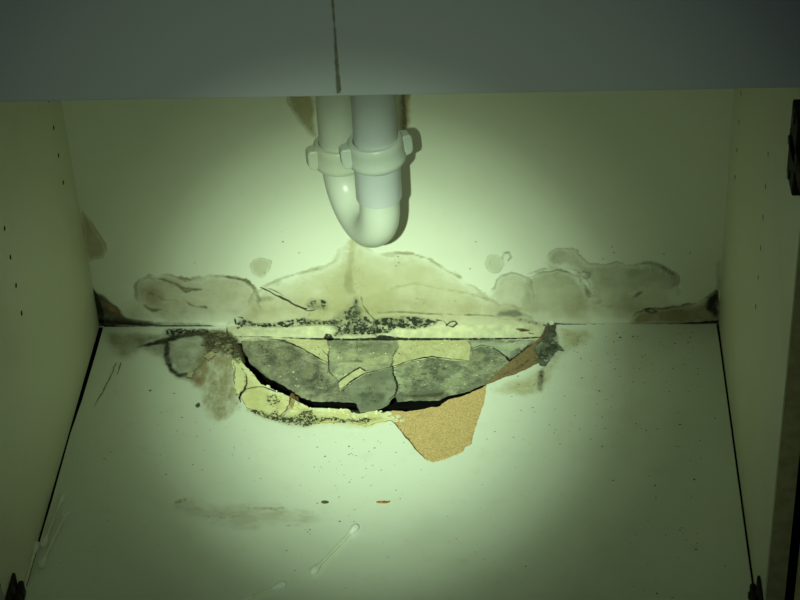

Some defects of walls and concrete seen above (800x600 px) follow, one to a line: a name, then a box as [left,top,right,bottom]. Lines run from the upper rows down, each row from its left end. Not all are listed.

damp [636,290,719,324]
crack [233,362,292,416]
damp [93,289,564,416]
crack [274,339,511,400]
spalling [232,326,557,462]